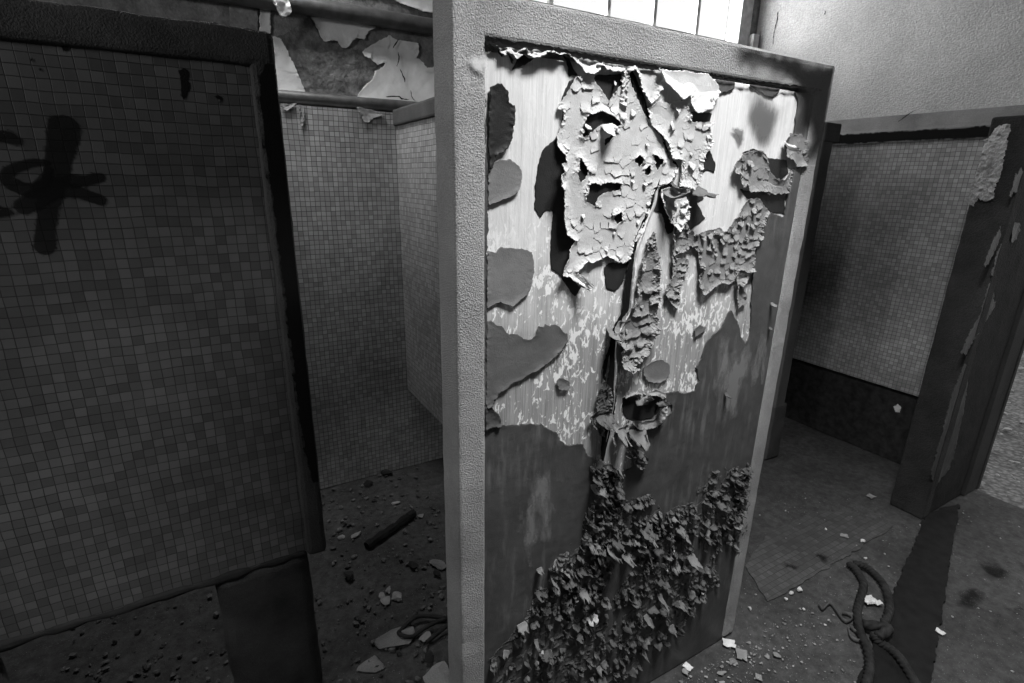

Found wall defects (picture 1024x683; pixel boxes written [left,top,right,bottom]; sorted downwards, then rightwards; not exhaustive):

spalling [229,4,435,102]
peeling [396,0,433,13]
spalling [966,124,1011,206]
peeling [485,45,810,683]